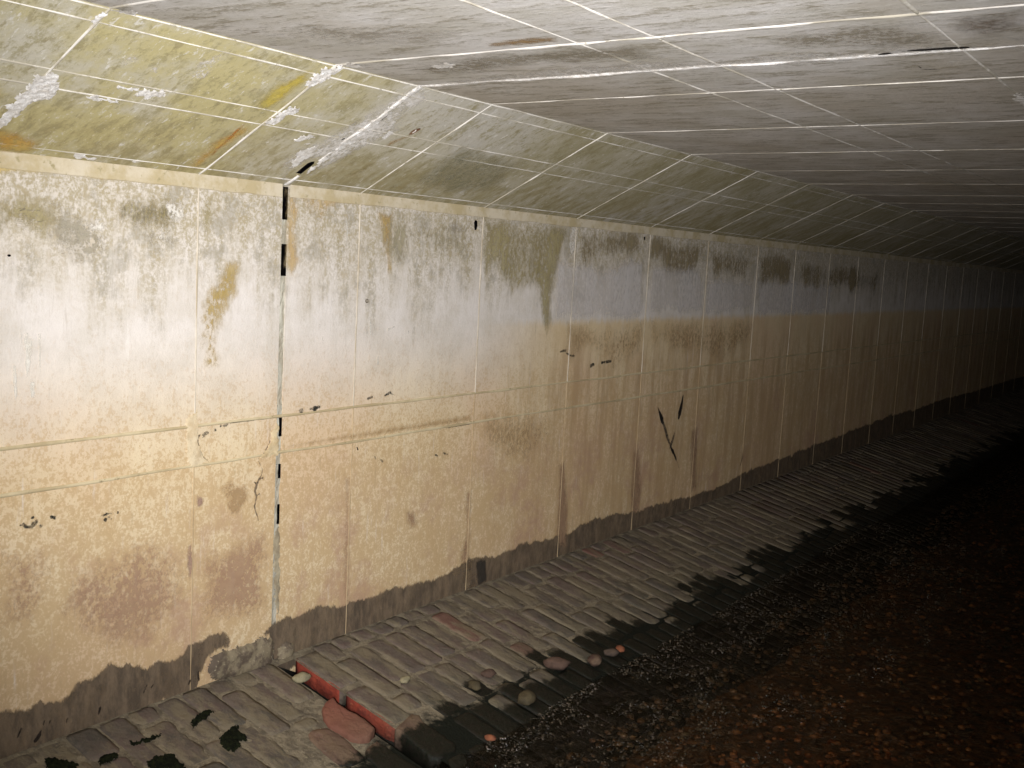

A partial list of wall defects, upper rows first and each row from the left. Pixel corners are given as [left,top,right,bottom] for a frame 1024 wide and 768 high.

leakage [0,72,60,129]
leakage [87,85,166,103]
leakage [262,62,365,125]
leakage [286,85,425,181]
crack [254,477,263,517]
leakage [0,632,230,759]